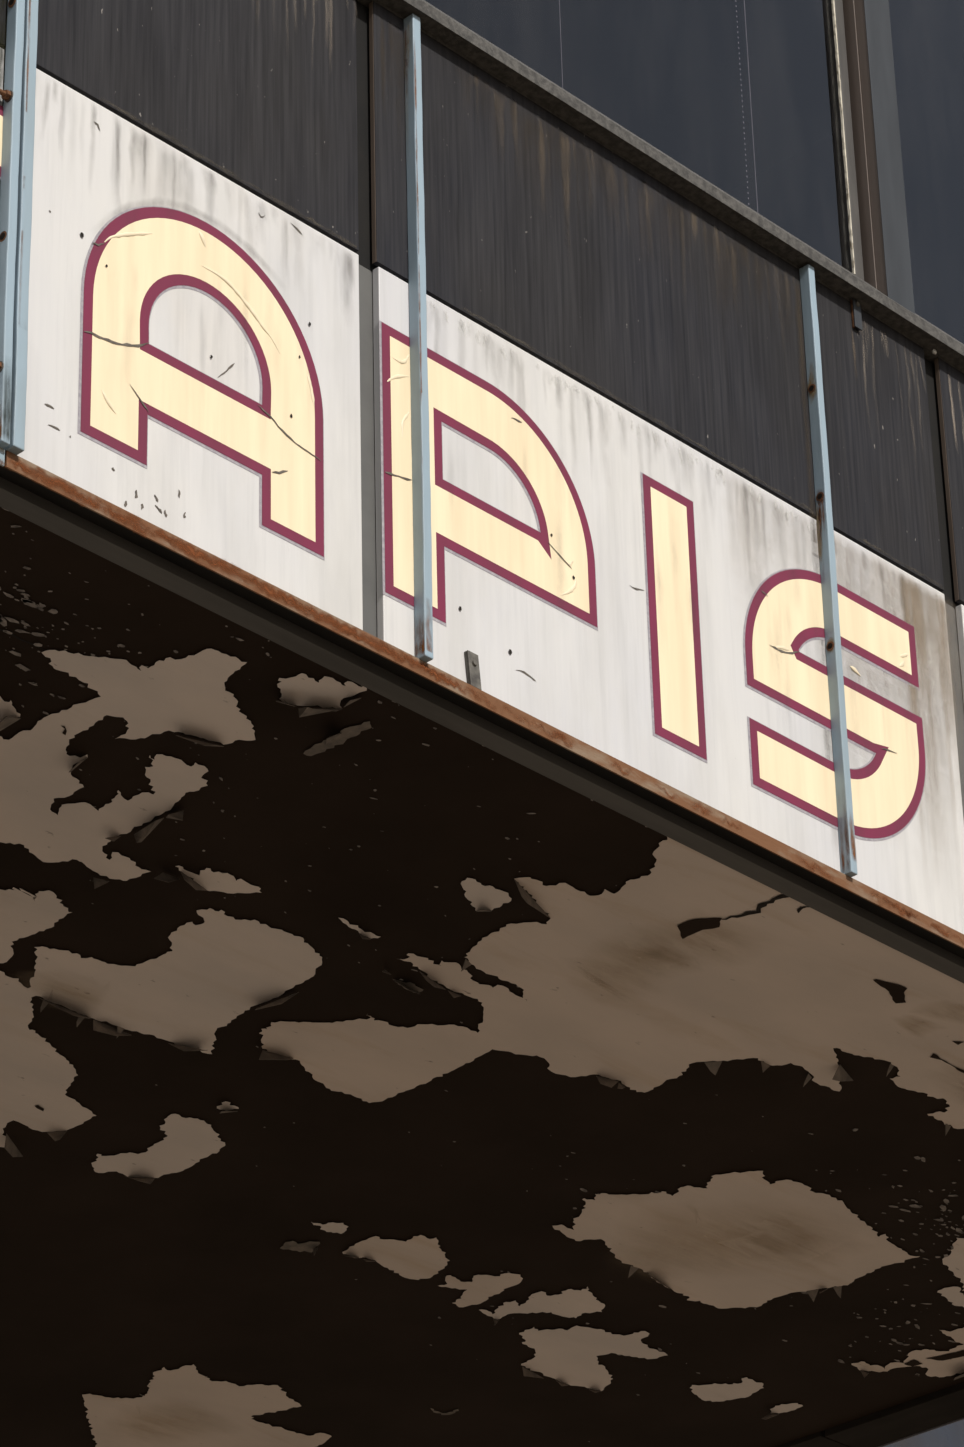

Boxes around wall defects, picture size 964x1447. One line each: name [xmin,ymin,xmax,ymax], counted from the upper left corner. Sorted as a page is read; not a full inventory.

crack [84,331,148,347]
crack [258,405,321,474]
rust [0,461,464,693]
peeling [276,673,367,717]
peeling [0,649,261,894]
rust [804,828,856,877]
peeling [0,837,964,1157]
peeling [91,1101,239,1184]
peeling [553,1171,920,1309]
peeling [280,1222,667,1393]
peeling [851,1328,964,1380]
peeling [82,1364,332,1447]